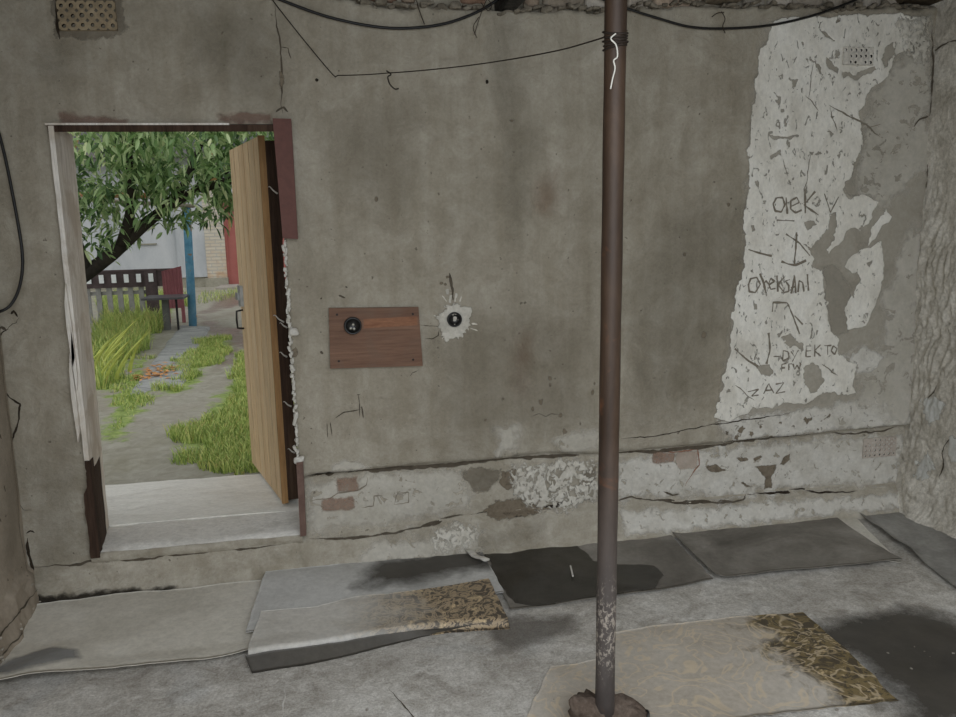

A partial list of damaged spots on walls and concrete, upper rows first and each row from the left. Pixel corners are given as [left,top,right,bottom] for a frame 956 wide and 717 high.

spalling [351,0,486,11]
spalling [497,0,605,16]
spalling [627,0,705,11]
peeling [714,0,945,440]
crack [619,413,897,454]
flaking render [652,449,726,483]
spalling [737,454,790,489]
flaking render [312,478,383,511]
peeling [463,458,598,521]
peeling [429,521,479,553]
damp [823,609,956,717]